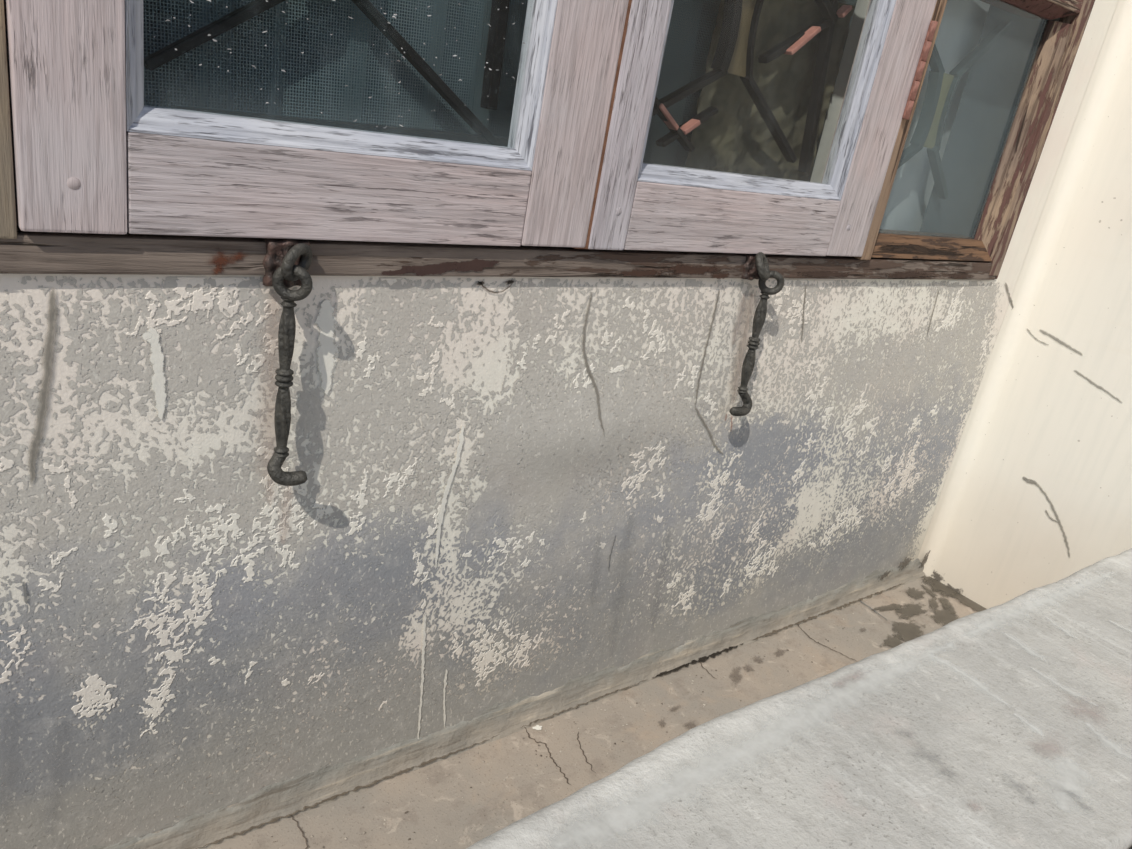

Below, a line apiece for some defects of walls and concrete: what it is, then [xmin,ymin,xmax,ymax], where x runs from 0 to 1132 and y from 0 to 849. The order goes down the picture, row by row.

crack [28,289,57,483]
crack [583,293,604,431]
crack [695,291,723,454]
crack [1005,283,1122,403]
peeling [0,276,1003,849]
crack [521,583,904,784]
water stain [556,643,1005,846]
water stain [873,550,1112,706]
crack [1023,477,1070,557]